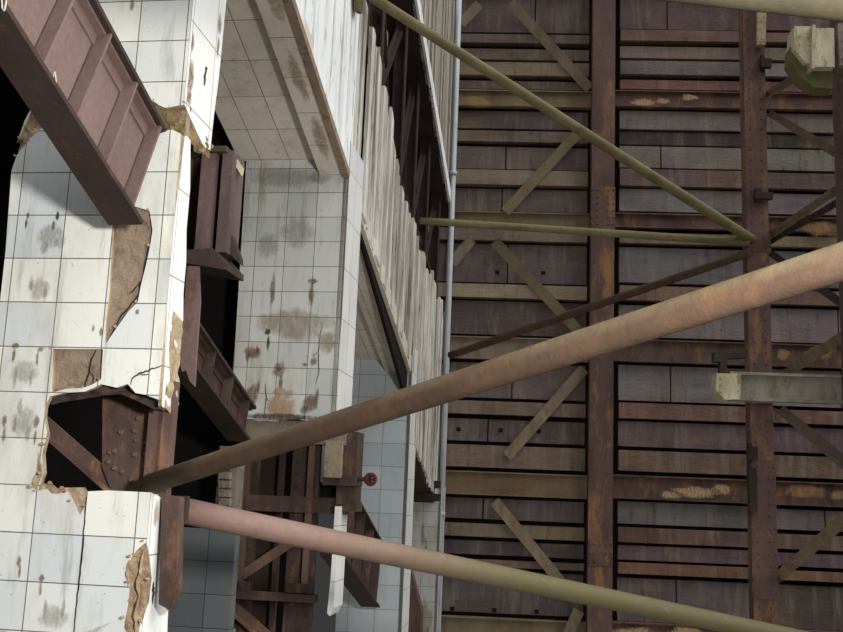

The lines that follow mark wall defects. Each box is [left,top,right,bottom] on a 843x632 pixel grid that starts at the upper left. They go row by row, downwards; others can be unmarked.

spalling [153,99,214,158]
spalling [103,207,153,340]
spalling [50,312,183,413]
spalling [28,442,88,514]
spalling [120,539,150,632]